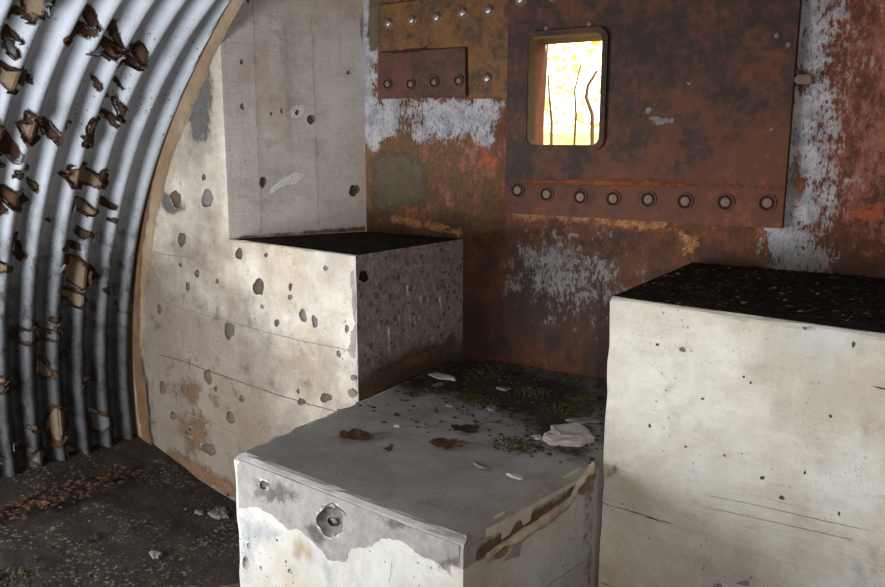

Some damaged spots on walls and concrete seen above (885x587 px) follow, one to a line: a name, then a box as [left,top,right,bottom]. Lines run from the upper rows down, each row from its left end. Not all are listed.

peeling [19,0,57,27]
peeling [0,30,27,95]
peeling [15,110,44,148]
peeling [85,115,101,148]
peeling [26,177,40,194]
peeling [61,161,109,218]
spalling [169,190,181,208]
spalling [201,174,214,208]
peeling [57,253,93,310]
peeling [542,422,595,447]
peeling [237,459,597,576]
crack [600,501,671,524]